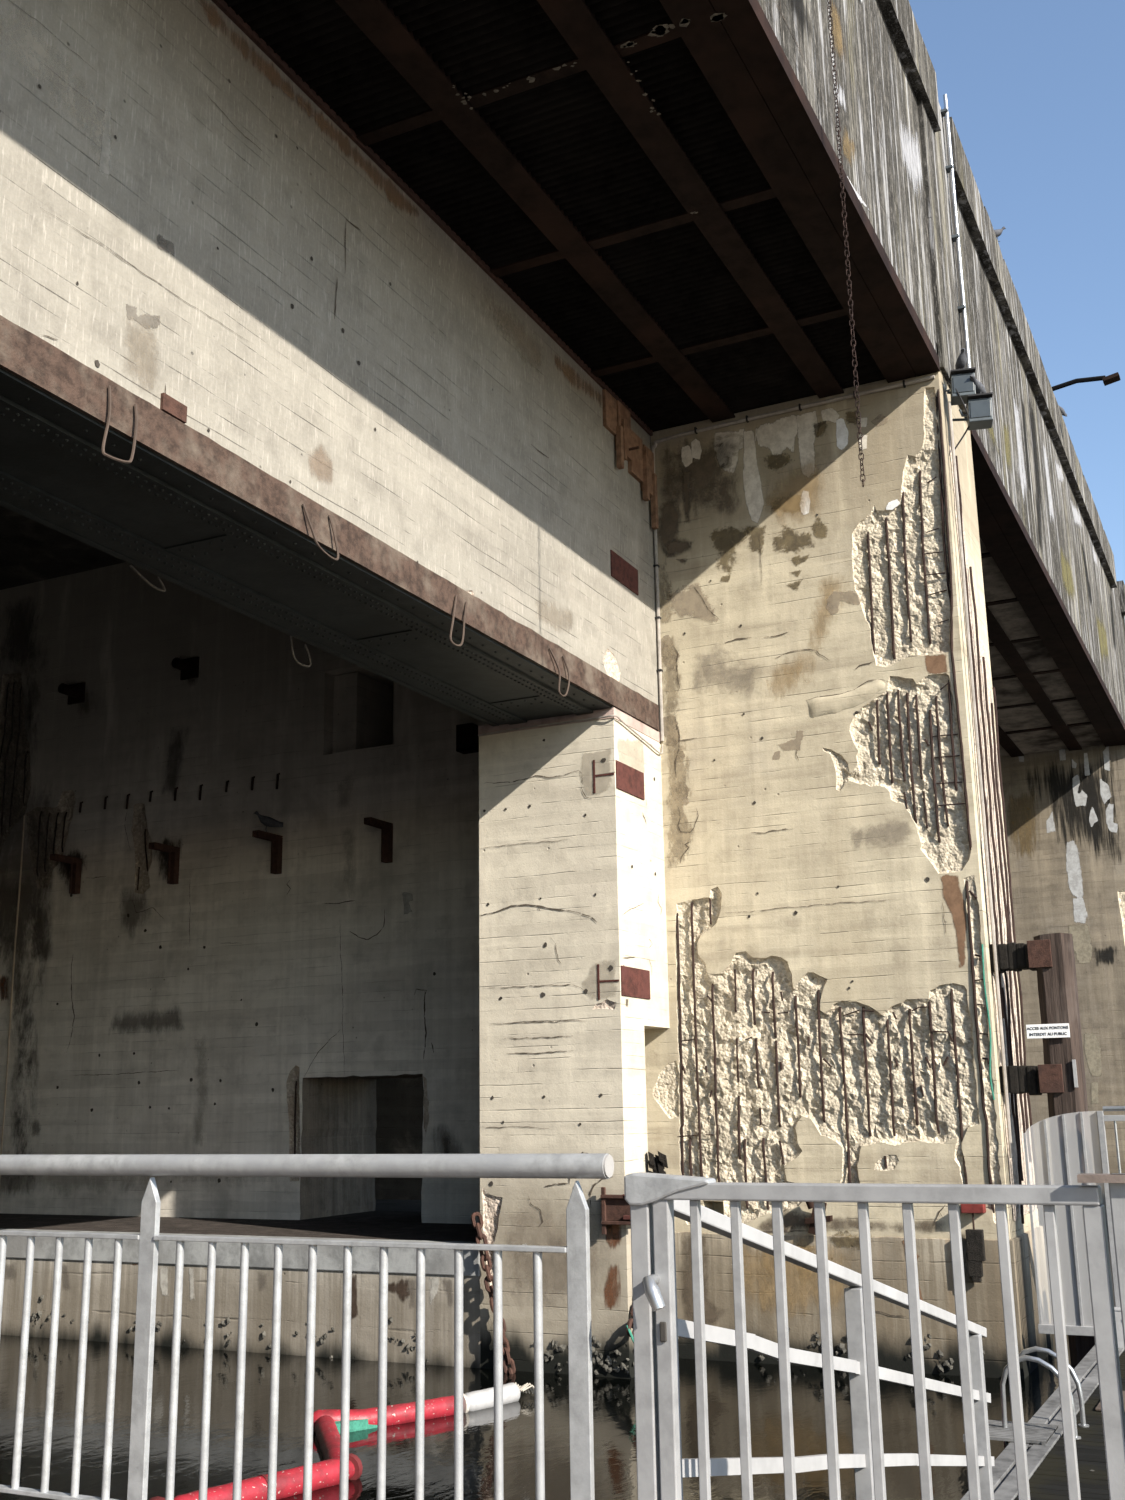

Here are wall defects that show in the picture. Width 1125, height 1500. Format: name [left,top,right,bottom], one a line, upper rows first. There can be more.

leakage [658,408,867,863]
leakage [0,687,50,976]
spalling [652,387,1038,1185]
rust [941,874,967,967]
leakage [1019,746,1121,924]
spalling [700,1200,802,1224]
spalling [991,1204,1040,1224]